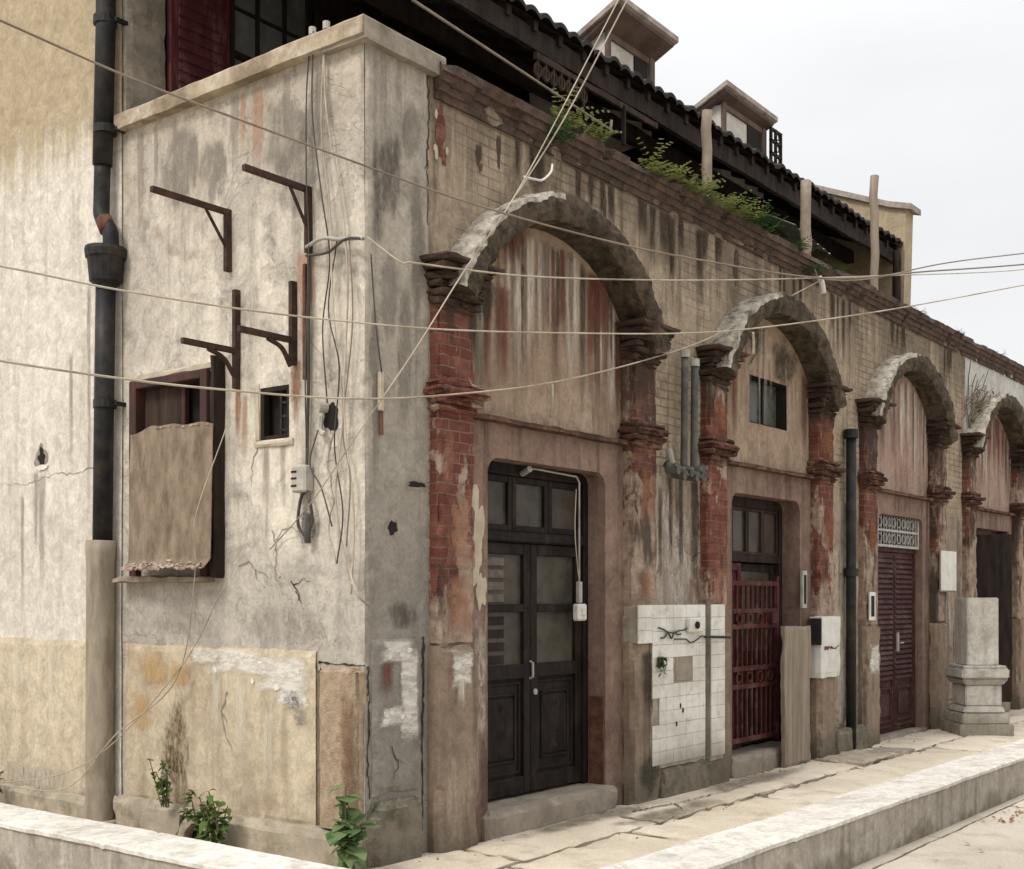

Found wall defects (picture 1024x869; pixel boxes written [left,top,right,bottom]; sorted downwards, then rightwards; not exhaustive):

spalling [433,102,449,166]
water stain [472,240,623,391]
crack [0,467,93,485]
crack [238,527,309,602]
spalling [472,484,487,611]
water stain [659,478,697,605]
peeling [192,648,307,707]
peeling [382,642,418,733]
water stain [163,710,188,777]